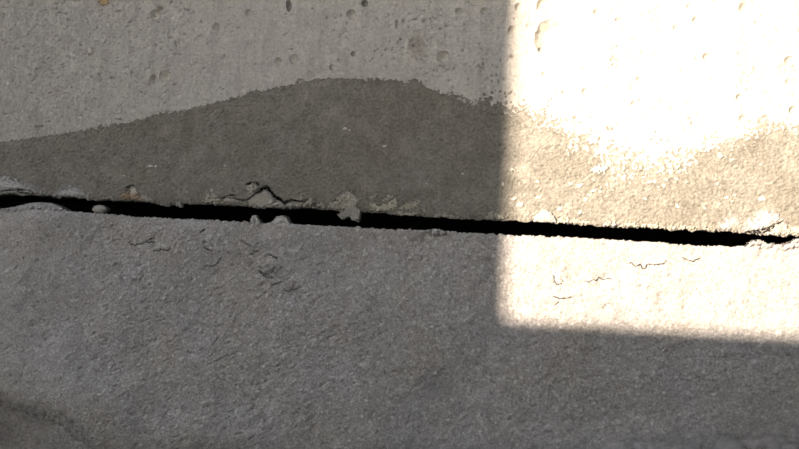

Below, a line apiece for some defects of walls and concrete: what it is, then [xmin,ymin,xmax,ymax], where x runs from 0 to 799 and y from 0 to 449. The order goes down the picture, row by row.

damp [0,77,799,252]
spalling [201,181,325,209]
crack [747,221,782,234]